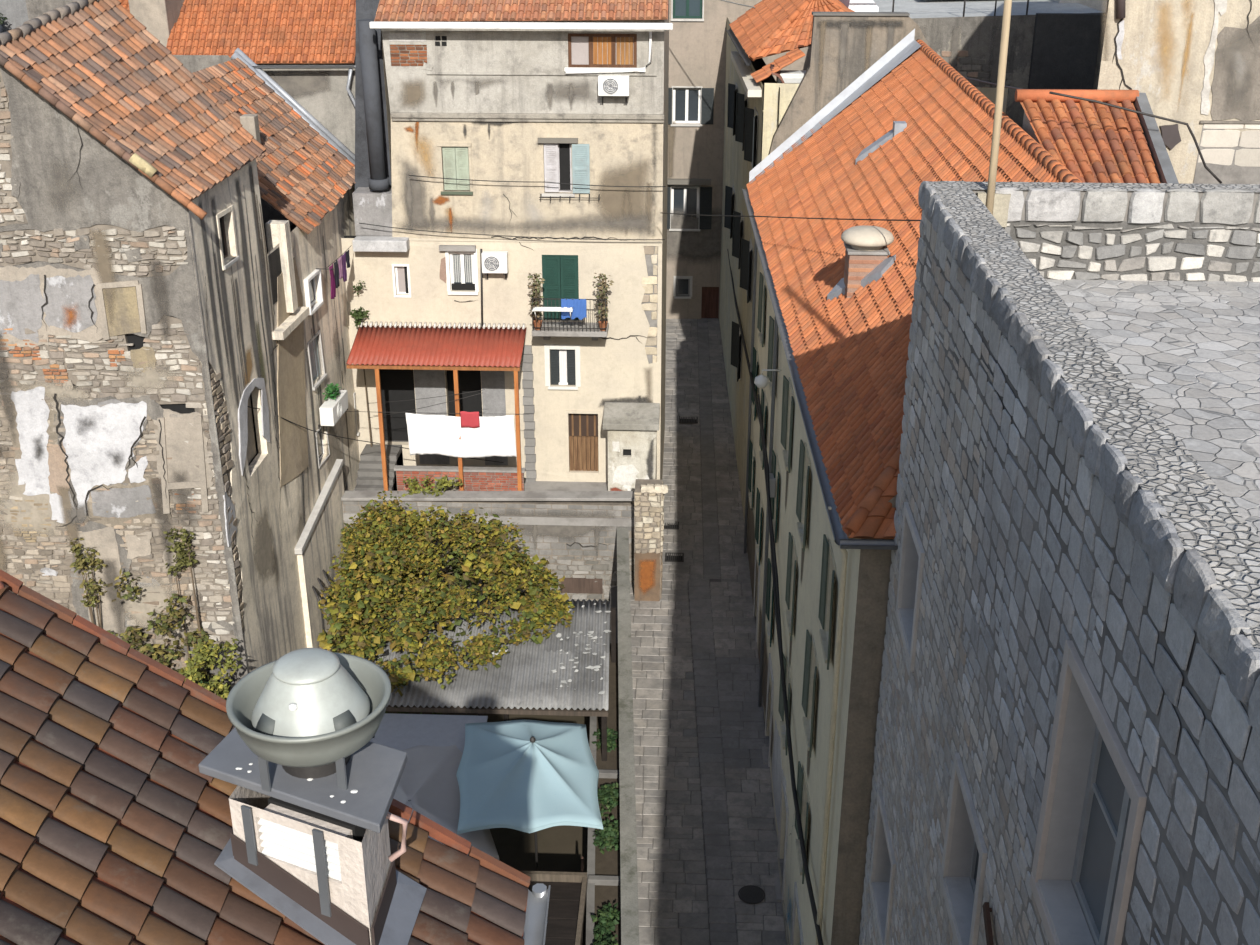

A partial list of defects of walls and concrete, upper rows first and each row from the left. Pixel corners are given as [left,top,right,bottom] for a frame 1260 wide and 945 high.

crack [1112,18,1132,90]
flaking render [0,71,308,671]